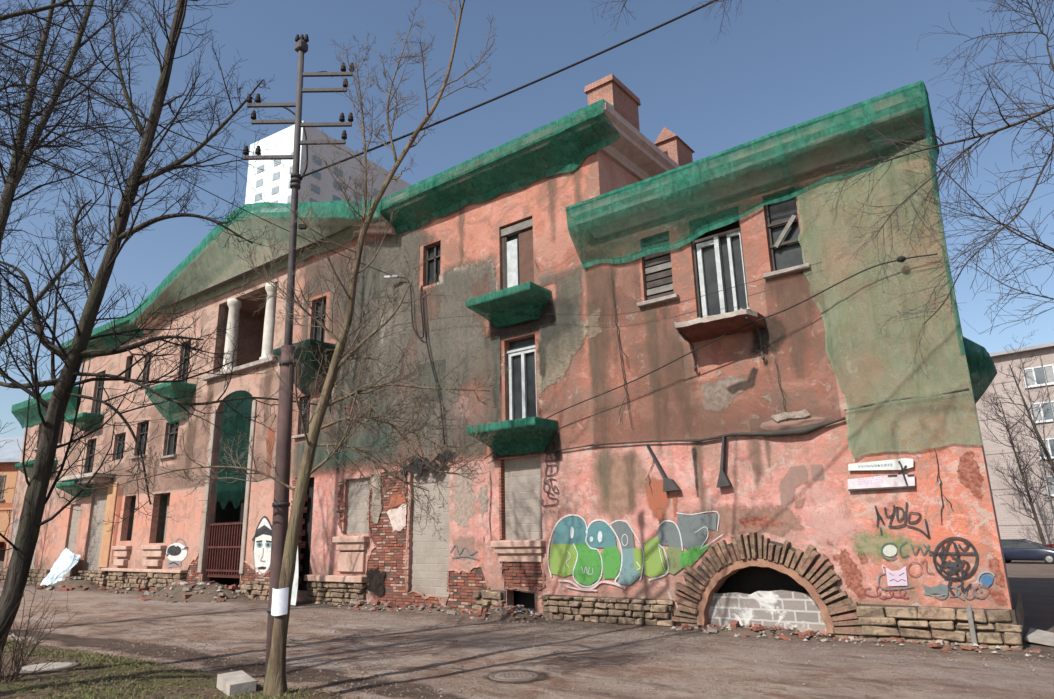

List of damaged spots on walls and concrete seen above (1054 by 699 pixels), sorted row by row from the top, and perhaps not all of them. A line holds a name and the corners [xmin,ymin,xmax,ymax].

flaking render [331,230,499,533]
damp [538,339,546,376]
flaking render [700,368,757,412]
rust [645,478,677,524]
crack [934,449,954,524]
flaking render [957,450,984,500]
flaking render [365,468,546,613]
flaking render [824,539,868,604]
flaking render [989,557,1007,606]